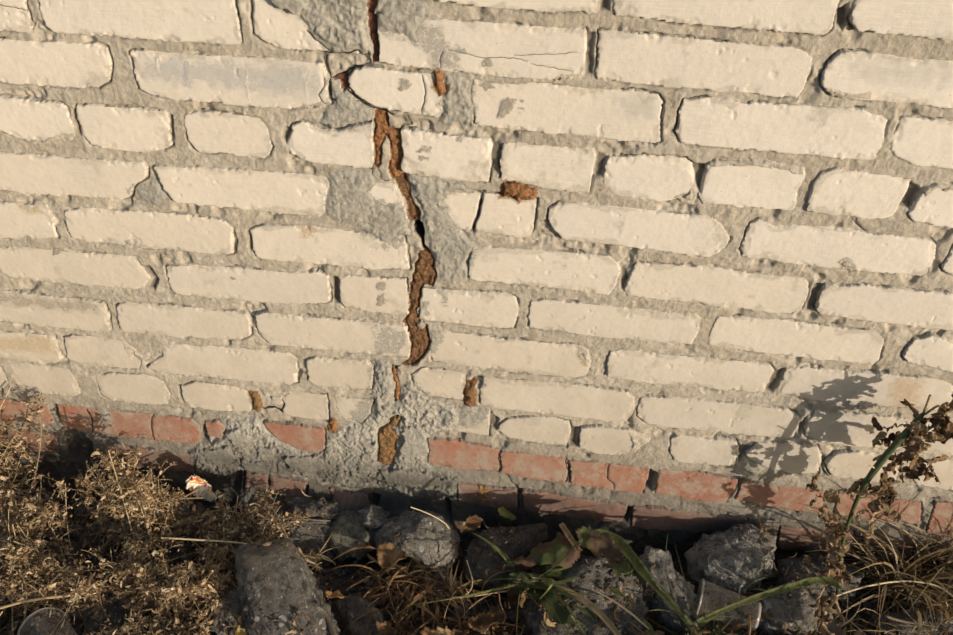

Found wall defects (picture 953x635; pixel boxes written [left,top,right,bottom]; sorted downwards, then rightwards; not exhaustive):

peeling [270,0,305,15]
crack [307,0,570,466]
peeling [400,424,429,458]